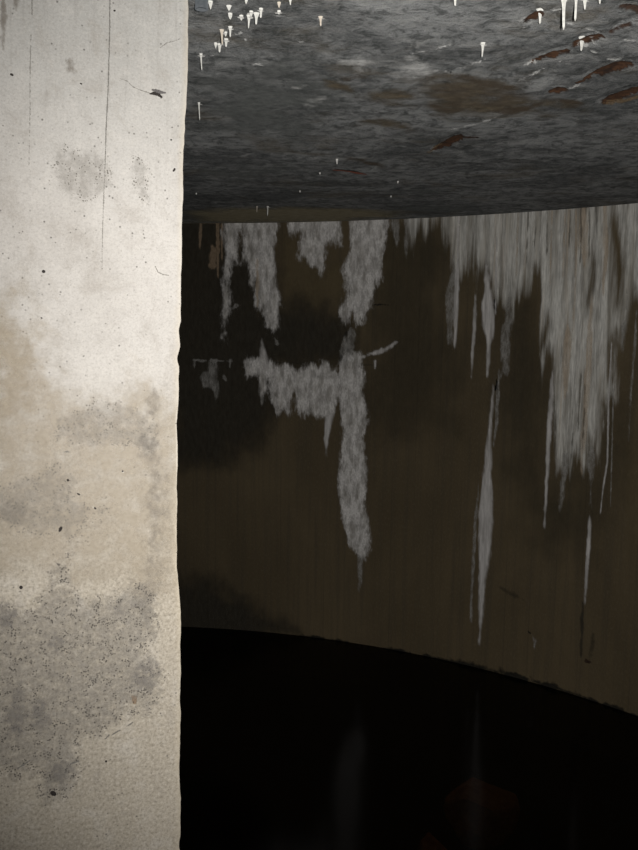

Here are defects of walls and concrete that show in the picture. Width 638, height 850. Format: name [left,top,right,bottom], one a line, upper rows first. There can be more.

leakage [177,203,638,574]
leakage [470,380,500,625]